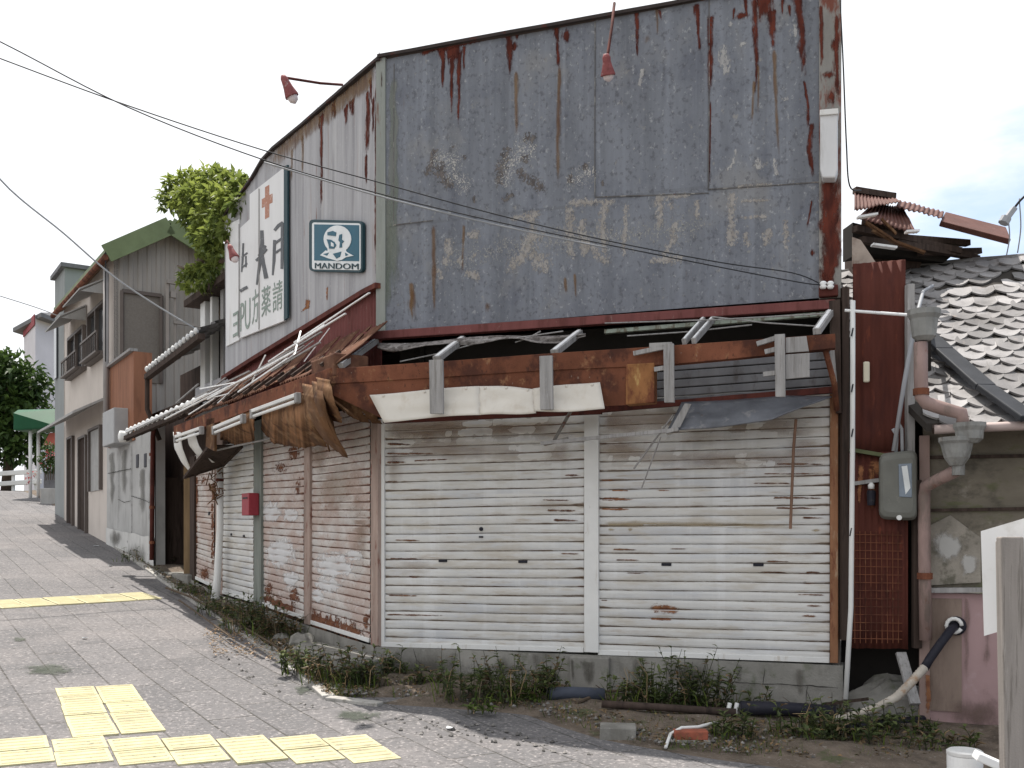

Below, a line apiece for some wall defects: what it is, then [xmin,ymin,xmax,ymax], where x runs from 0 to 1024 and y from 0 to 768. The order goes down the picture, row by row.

rust [422,40,484,119]
rust [693,4,714,86]
rust [819,6,839,104]
rust [318,53,382,246]
peeling [431,145,476,203]
peeling [497,132,545,202]
rust [807,179,842,282]
rust [196,475,215,579]
peeling [263,501,298,521]
spalling [936,534,975,573]
rust [264,583,300,618]
rust [651,605,679,620]